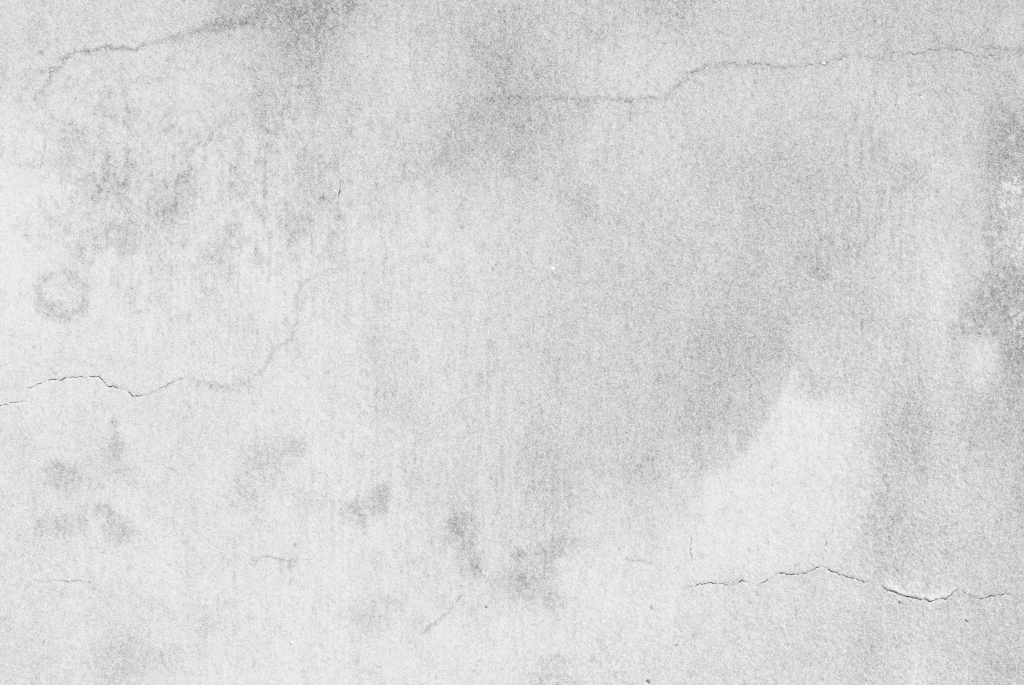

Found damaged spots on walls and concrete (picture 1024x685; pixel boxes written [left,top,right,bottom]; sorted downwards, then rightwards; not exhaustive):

crack [482,44,1024,121]
crack [0,266,333,406]
crack [683,538,1005,602]